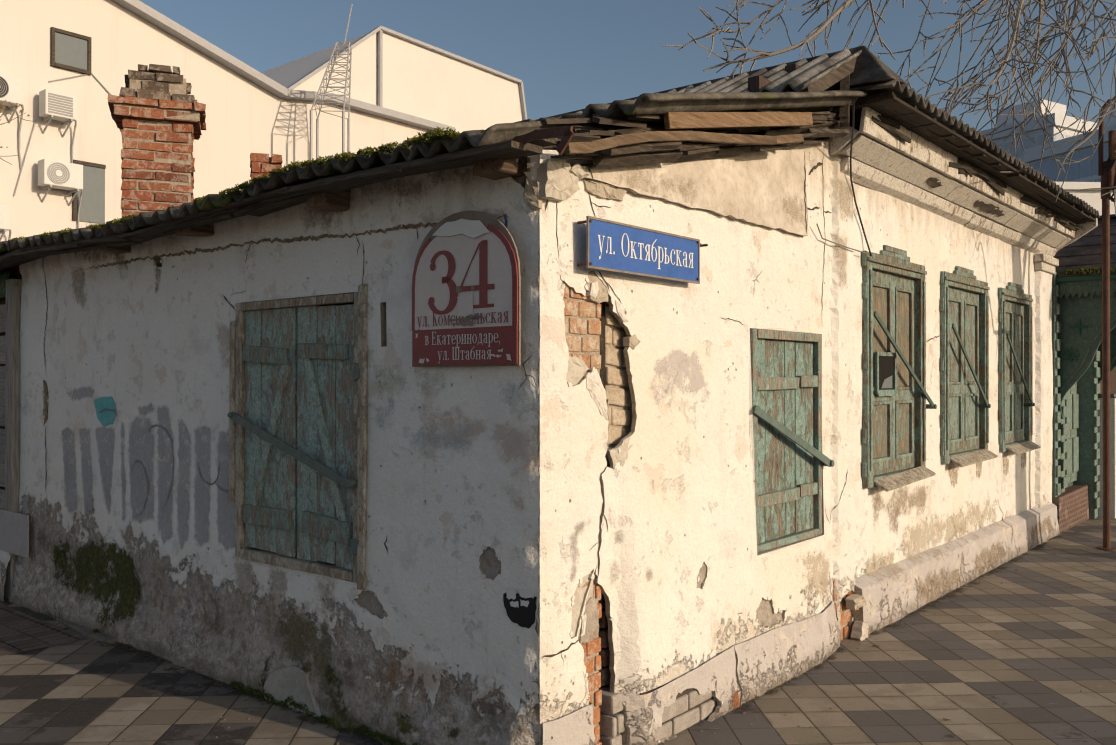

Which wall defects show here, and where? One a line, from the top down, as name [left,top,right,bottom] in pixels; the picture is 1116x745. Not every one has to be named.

peeling [974,200,1004,217]
crack [76,222,437,284]
crack [519,200,559,572]
flaking render [560,270,641,468]
crack [591,467,608,576]
leakage [875,489,926,529]
flaking render [755,597,789,627]
flaking render [833,579,877,641]
crack [535,604,582,686]
flaking render [569,571,625,745]
crack [732,645,743,707]
flaking render [640,679,723,743]